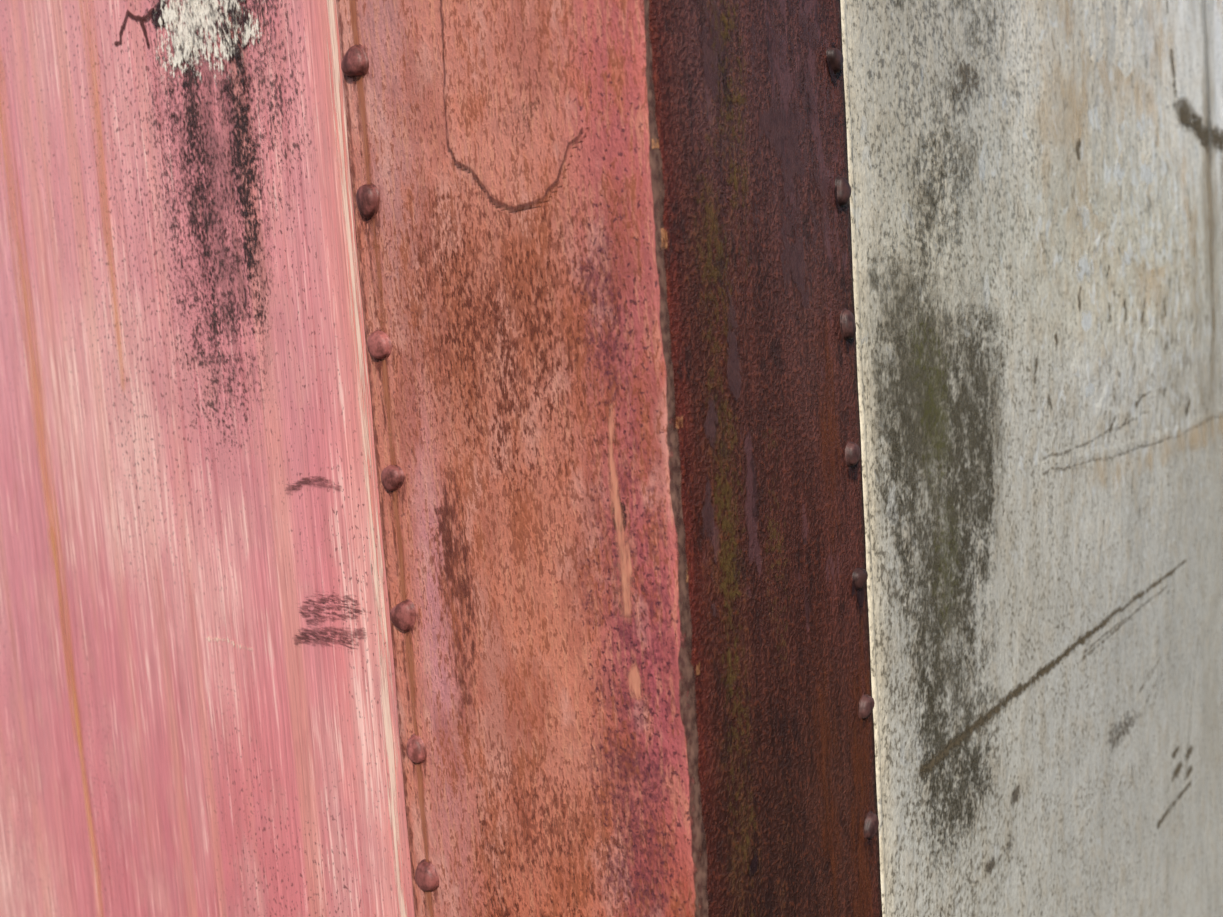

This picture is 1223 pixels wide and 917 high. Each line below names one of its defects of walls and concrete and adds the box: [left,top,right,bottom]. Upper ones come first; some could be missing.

peeling [156,0,261,78]
water stain [144,0,309,452]
corrosion [339,0,383,340]
corrosion [367,347,438,917]
corrosion [433,473,475,717]
corrosion [398,188,620,497]
crack [439,0,589,212]
corrosion [468,760,641,917]
water stain [887,429,914,573]
water stain [917,572,991,842]
water stain [950,343,995,644]
crack [1041,406,1223,475]